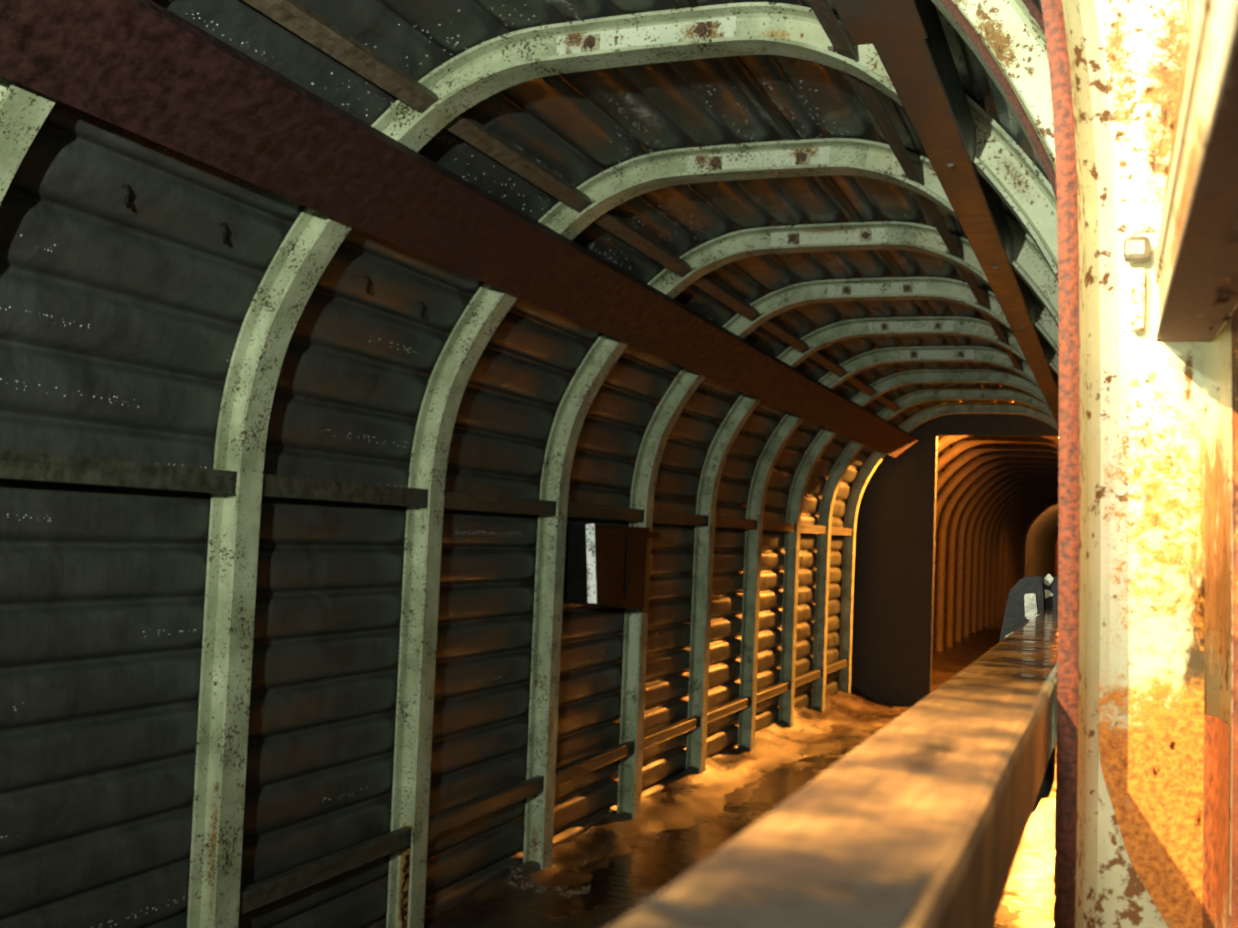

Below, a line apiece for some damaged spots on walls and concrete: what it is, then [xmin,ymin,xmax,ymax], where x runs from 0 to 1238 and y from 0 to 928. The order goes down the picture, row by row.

rust [565,33,583,54]
rust [941,0,1080,928]
rust [1098,650,1230,928]
rust [1104,0,1238,660]